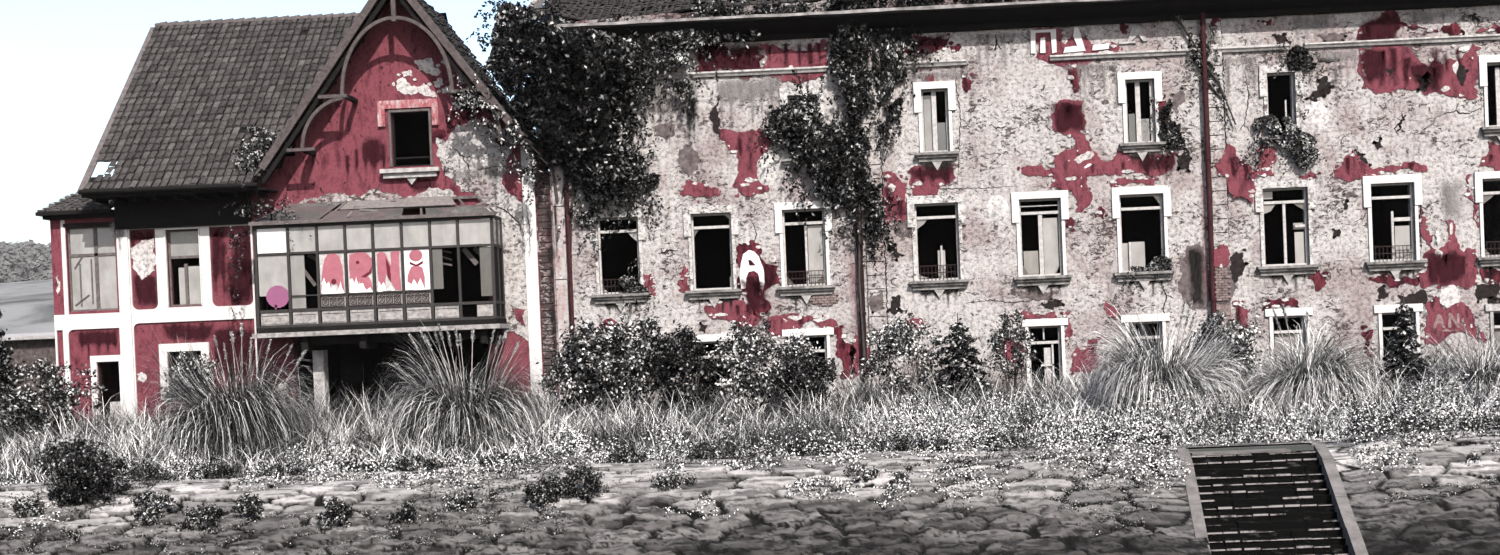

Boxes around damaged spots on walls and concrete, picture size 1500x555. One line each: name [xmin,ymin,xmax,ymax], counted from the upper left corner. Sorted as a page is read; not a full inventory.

peeling [1304,10,1500,102]
spalling [300,58,539,342]
peeling [655,39,830,203]
peeling [1017,23,1193,232]
peeling [1211,144,1277,204]
peeling [1299,137,1428,210]
peeling [1464,137,1500,228]
spalling [131,238,156,280]
peeling [643,273,656,296]
peeling [678,266,690,292]
peeling [699,240,871,382]
peeling [1369,208,1500,345]